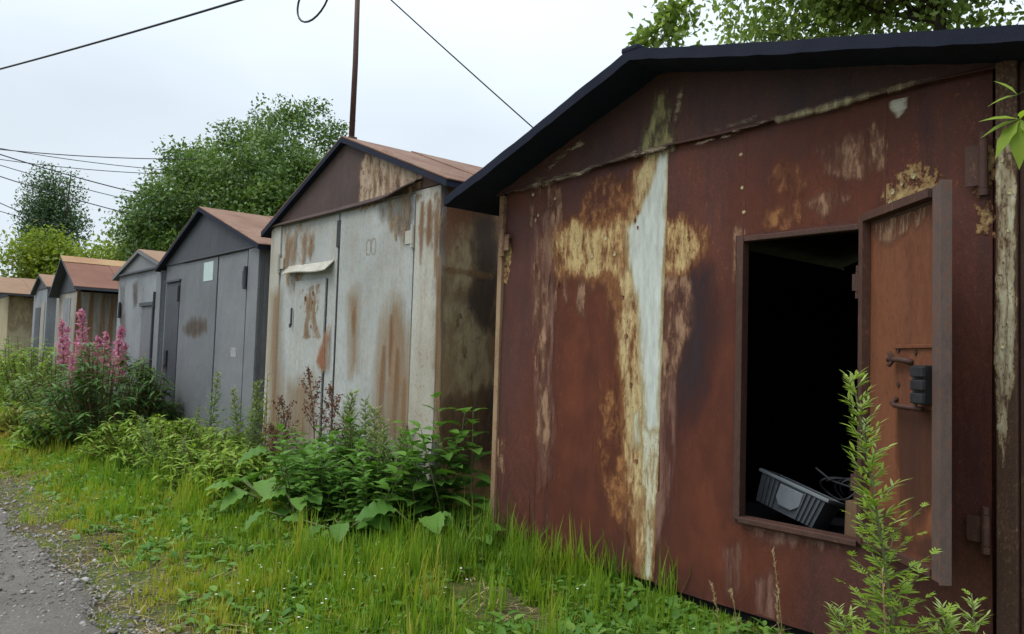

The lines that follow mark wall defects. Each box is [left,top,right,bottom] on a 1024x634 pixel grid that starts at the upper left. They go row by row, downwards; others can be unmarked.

corrosion [302,285,329,371]
corrosion [375,302,409,438]
water stain [468,218,498,332]
corrosion [558,173,634,257]
corrosion [538,241,693,581]
peeling [529,146,707,581]
corrosion [763,164,851,231]
corrosion [825,122,888,180]
corrosion [874,203,926,244]
peeling [880,161,943,204]
peeling [972,143,1018,468]
corrosion [869,409,932,566]